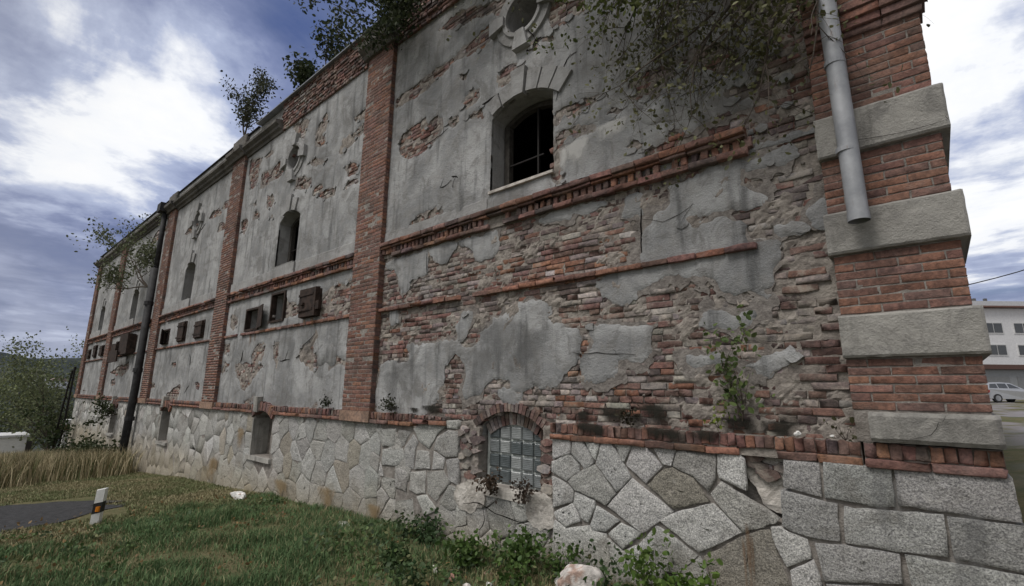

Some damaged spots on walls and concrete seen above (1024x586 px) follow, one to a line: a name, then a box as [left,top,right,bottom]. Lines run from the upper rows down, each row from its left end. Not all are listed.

flaking render [239,108,366,234]
flaking render [376,0,857,531]
crack [638,191,693,253]
flaking render [222,340,280,391]
flaking render [295,278,352,372]